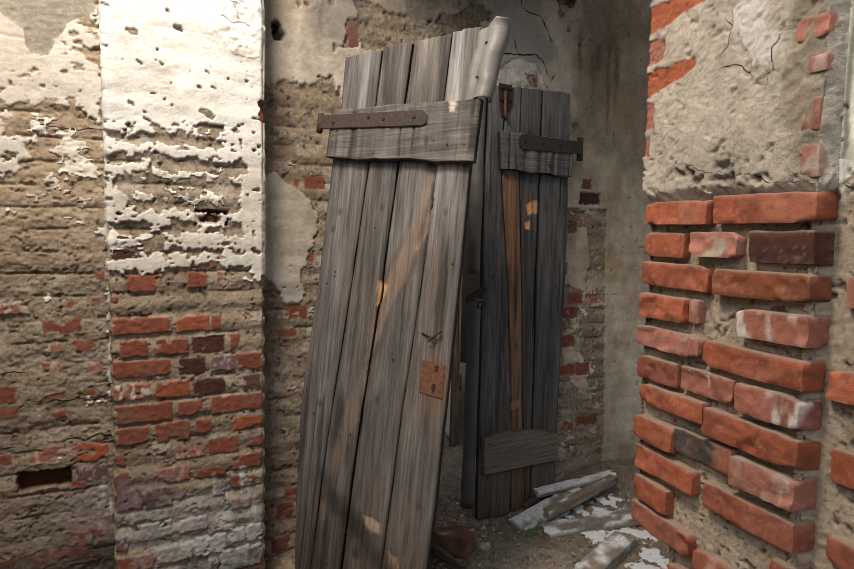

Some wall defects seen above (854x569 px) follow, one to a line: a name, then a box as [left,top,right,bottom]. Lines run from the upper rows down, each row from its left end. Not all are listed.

peeling [0,0,97,56]
peeling [72,48,101,77]
spalling [271,21,286,42]
peeling [344,0,490,51]
crack [504,0,555,79]
crack [720,19,797,88]
peeling [643,0,854,213]
spalling [0,76,341,569]